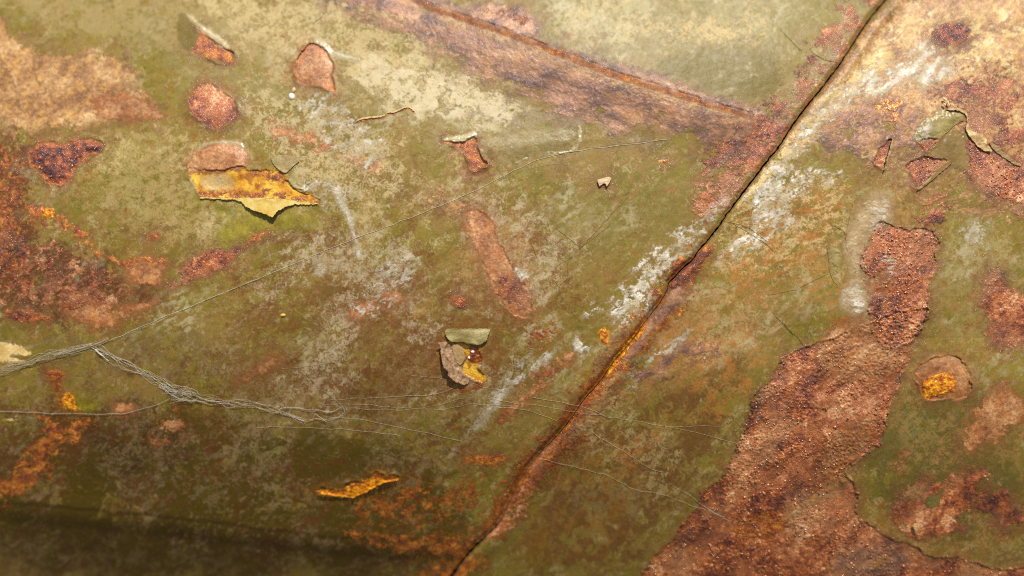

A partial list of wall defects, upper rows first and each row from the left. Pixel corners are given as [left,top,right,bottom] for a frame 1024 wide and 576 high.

peeling [186,13,235,66]
peeling [291,38,361,96]
rust [0,30,276,334]
peeling [187,138,320,217]
peeling [442,132,487,173]
leakage [584,38,954,331]
peeling [913,97,1021,172]
crack [449,0,888,576]
rust [316,0,1024,576]
peeling [437,328,490,389]
leakage [627,337,682,380]
rust [0,367,98,508]